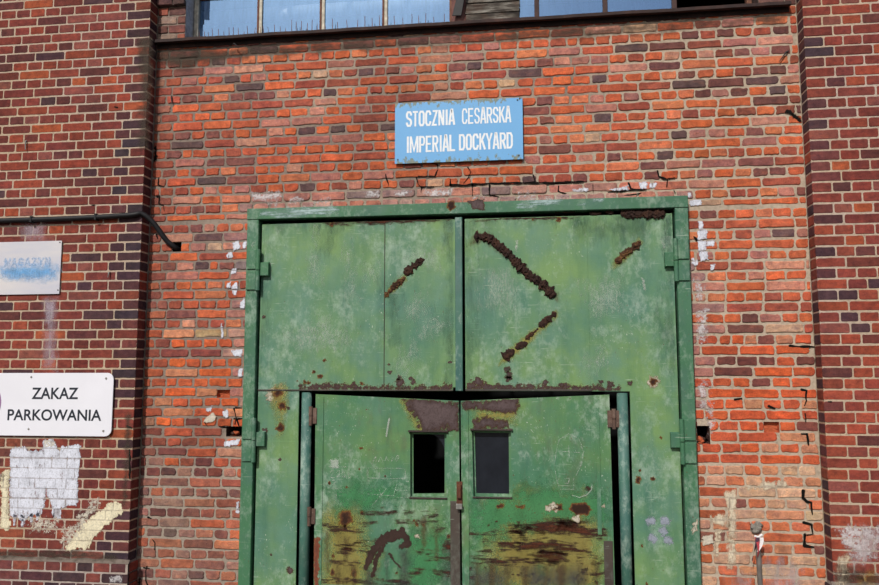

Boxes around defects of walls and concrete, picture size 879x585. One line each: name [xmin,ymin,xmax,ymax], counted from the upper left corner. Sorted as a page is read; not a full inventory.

corrosion [325,200,456,227]
corrosion [589,209,666,220]
corrosion [384,257,425,297]
corrosion [473,230,557,299]
corrosion [614,240,641,268]
corrosion [297,311,633,431]
corrosion [262,383,290,432]
hole [697,426,710,445]
peeling [25,508,61,532]
corrosion [314,510,451,585]
corrosion [469,502,607,585]
leakage [837,526,879,585]